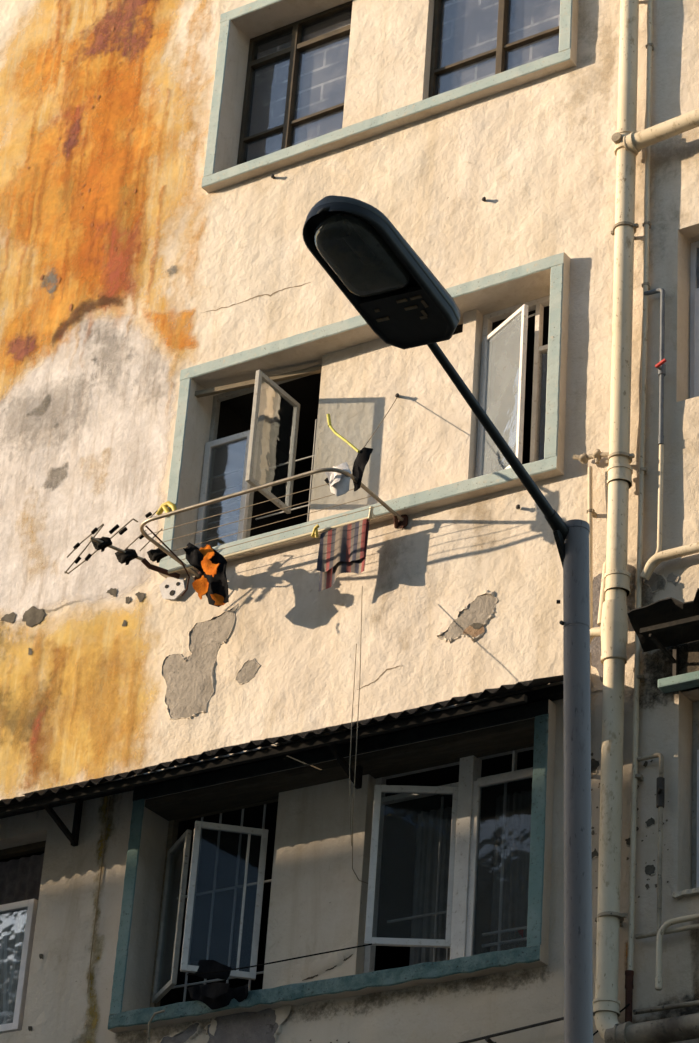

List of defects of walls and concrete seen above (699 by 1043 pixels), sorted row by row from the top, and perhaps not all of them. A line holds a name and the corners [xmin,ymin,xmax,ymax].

corrosion [0,0,196,402]
crack [204,282,310,313]
spalling [436,590,499,644]
peeling [161,603,238,720]
peeling [235,658,261,685]
damp [77,899,101,1043]
spalling [160,1005,291,1043]